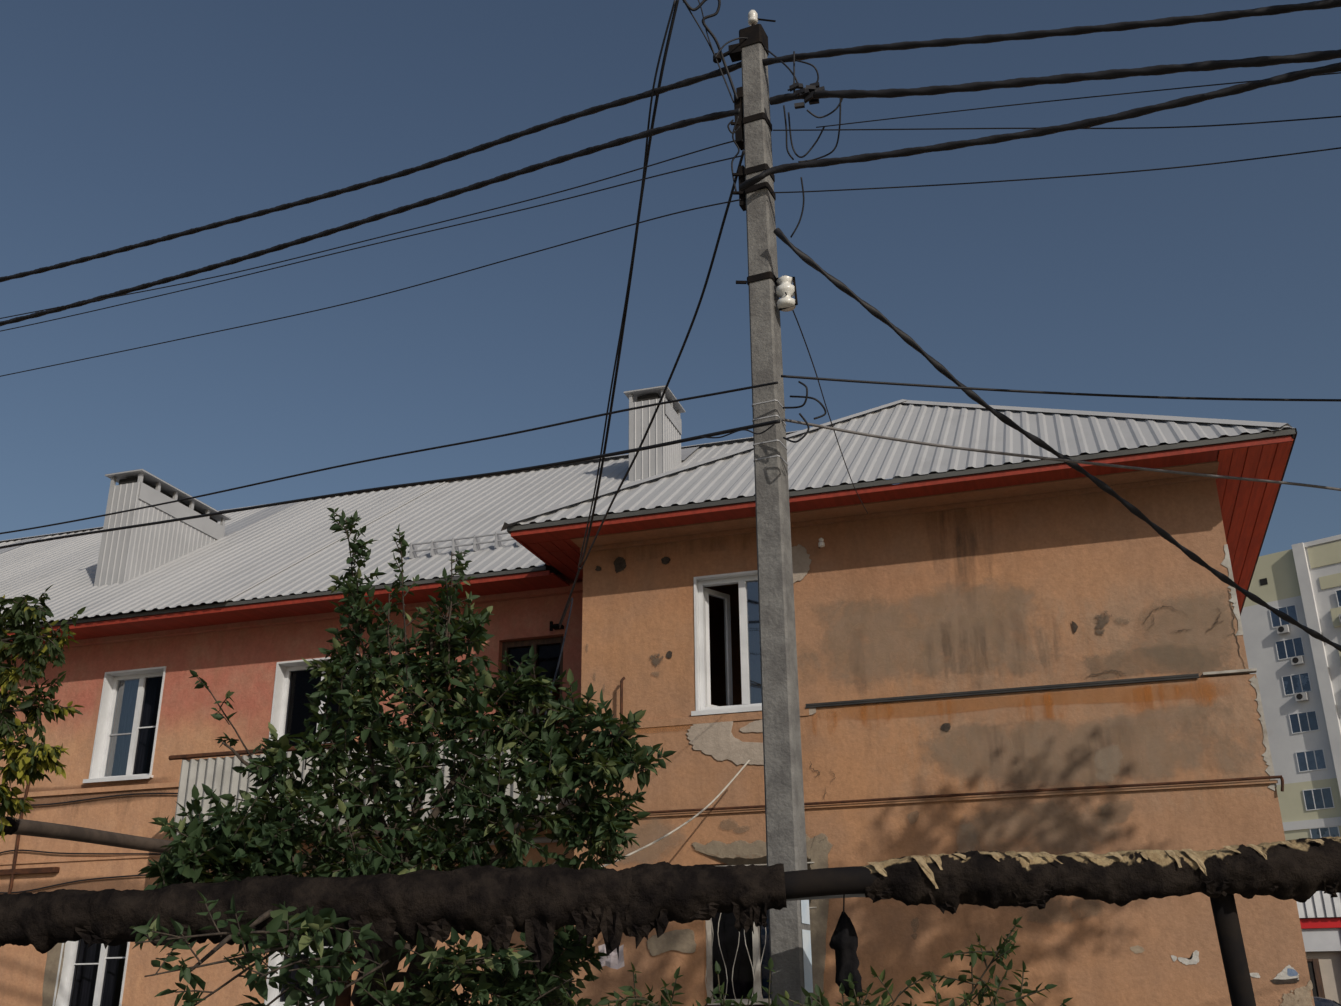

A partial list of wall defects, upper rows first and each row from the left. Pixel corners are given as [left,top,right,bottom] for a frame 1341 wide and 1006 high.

crack [1144,590,1246,669]
spalling [686,719,764,765]
peeling [1171,950,1199,965]
spalling [1279,980,1313,1006]